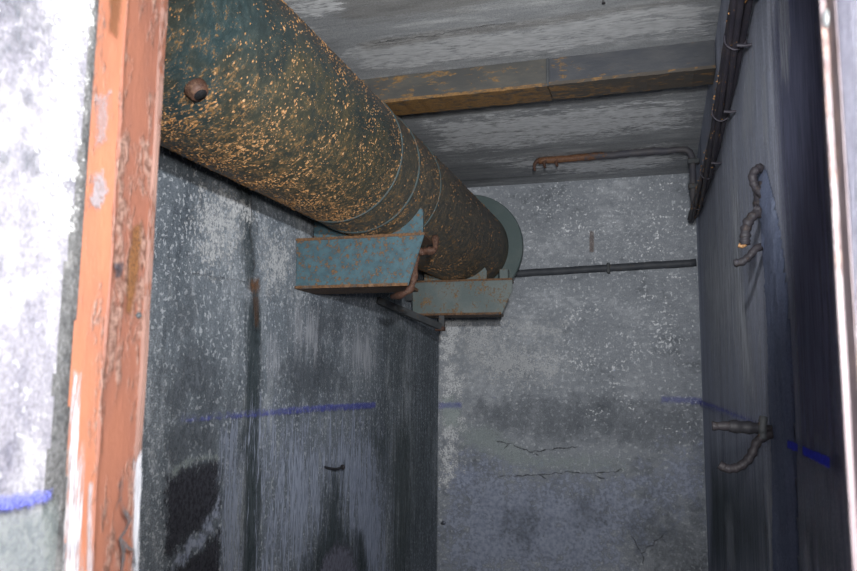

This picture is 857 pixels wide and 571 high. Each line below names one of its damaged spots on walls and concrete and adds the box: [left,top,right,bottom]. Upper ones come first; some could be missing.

crack [497,441,622,479]
damp [304,466,367,571]